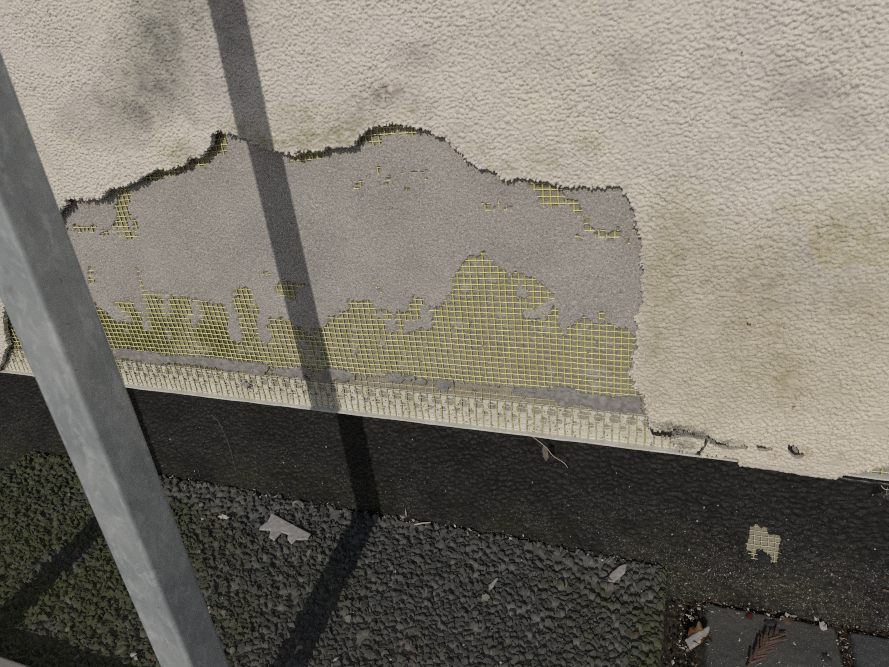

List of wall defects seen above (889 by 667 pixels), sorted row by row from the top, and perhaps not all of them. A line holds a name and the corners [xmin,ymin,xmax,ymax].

flaking render [61,124,729,448]
flaking render [1,316,33,373]
crack [650,428,747,455]
flaking render [838,466,889,488]
peeling [746,524,781,566]